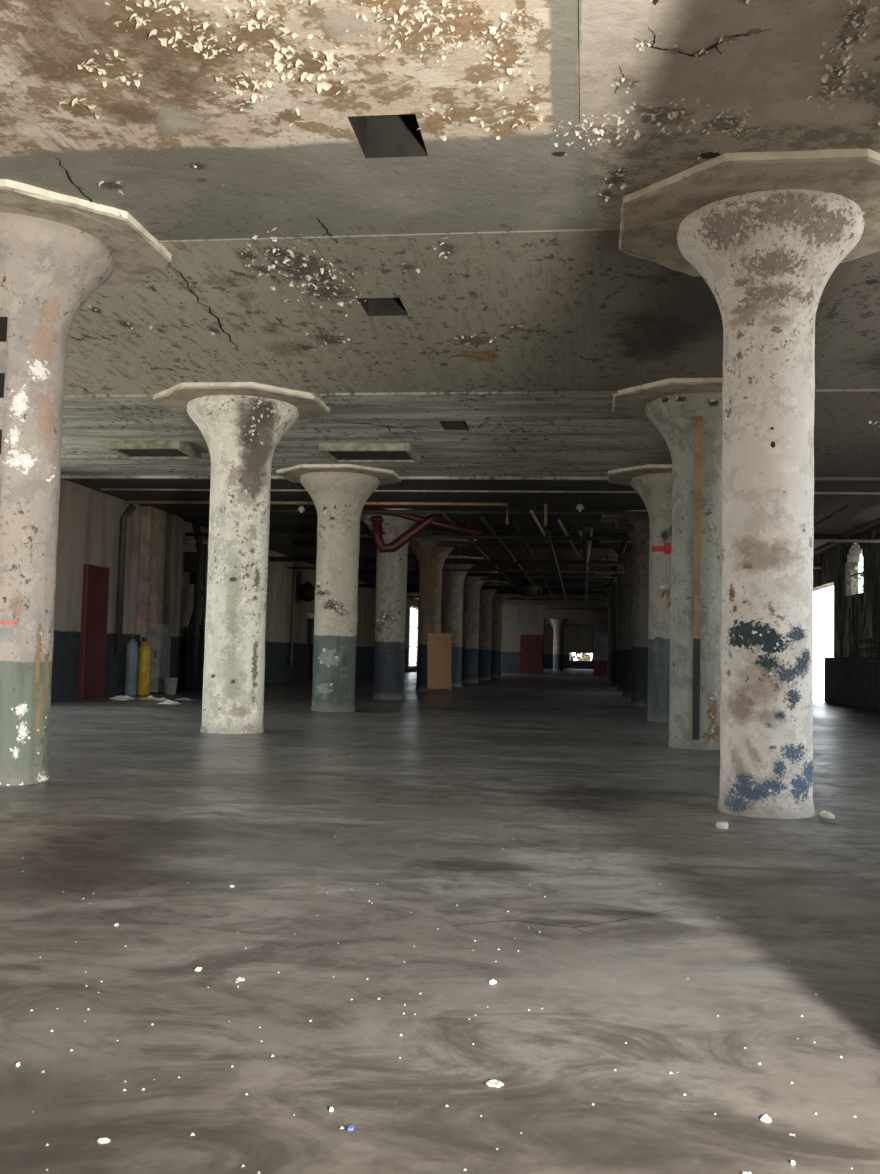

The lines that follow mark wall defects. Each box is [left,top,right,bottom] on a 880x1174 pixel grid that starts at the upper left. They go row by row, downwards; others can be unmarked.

peeling [59,47,143,119]
peeling [113,0,358,111]
peeling [273,108,304,126]
peeling [342,0,763,156]
crack [634,26,771,57]
spalling [697,151,721,160]
peeling [807,0,880,126]
crack [168,263,239,351]
peeling [237,228,366,316]
peeling [2,359,56,483]
peeling [726,584,811,720]
peeling [723,742,815,814]